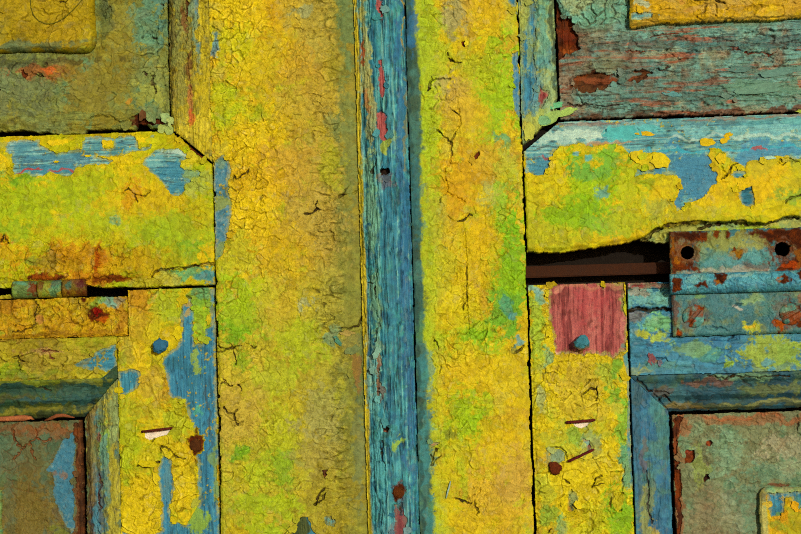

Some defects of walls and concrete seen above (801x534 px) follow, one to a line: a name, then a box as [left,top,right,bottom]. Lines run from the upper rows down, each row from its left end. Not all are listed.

peeling [0,110,234,260]
crack [303,200,321,215]
peeling [523,109,801,212]
crack [339,316,380,342]
corrosion [669,230,744,321]
corrosion [745,227,801,285]
corrosion [771,297,801,334]
peeling [138,288,221,534]
crack [217,345,257,426]
peeling [46,422,87,534]
crack [313,488,326,506]
corrosion [391,479,407,516]